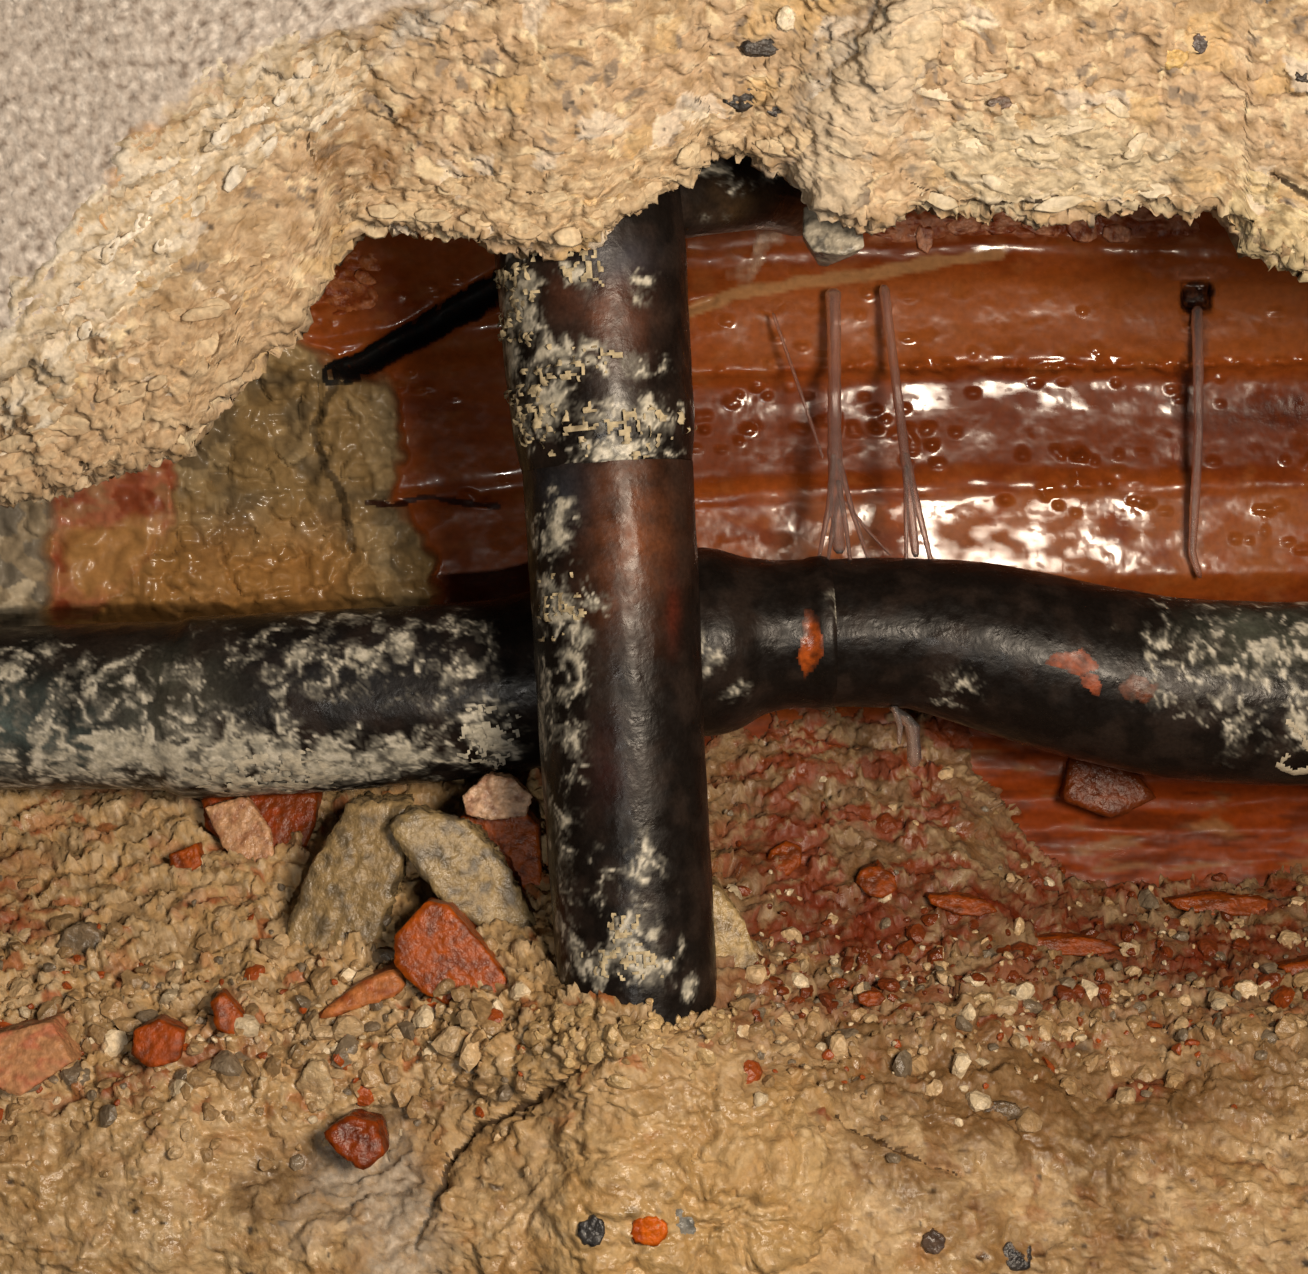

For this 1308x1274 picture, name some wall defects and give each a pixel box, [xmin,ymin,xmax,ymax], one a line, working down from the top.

spalling [916,88,952,102]
spalling [961,72,1007,86]
spalling [0,30,814,505]
spalling [802,97,1200,266]
spalling [1229,169,1308,282]
peeling [798,621,823,671]
peeling [1050,648,1102,694]
peeling [1120,675,1157,703]
damp [240,1141,428,1274]
crack [413,1057,605,1252]